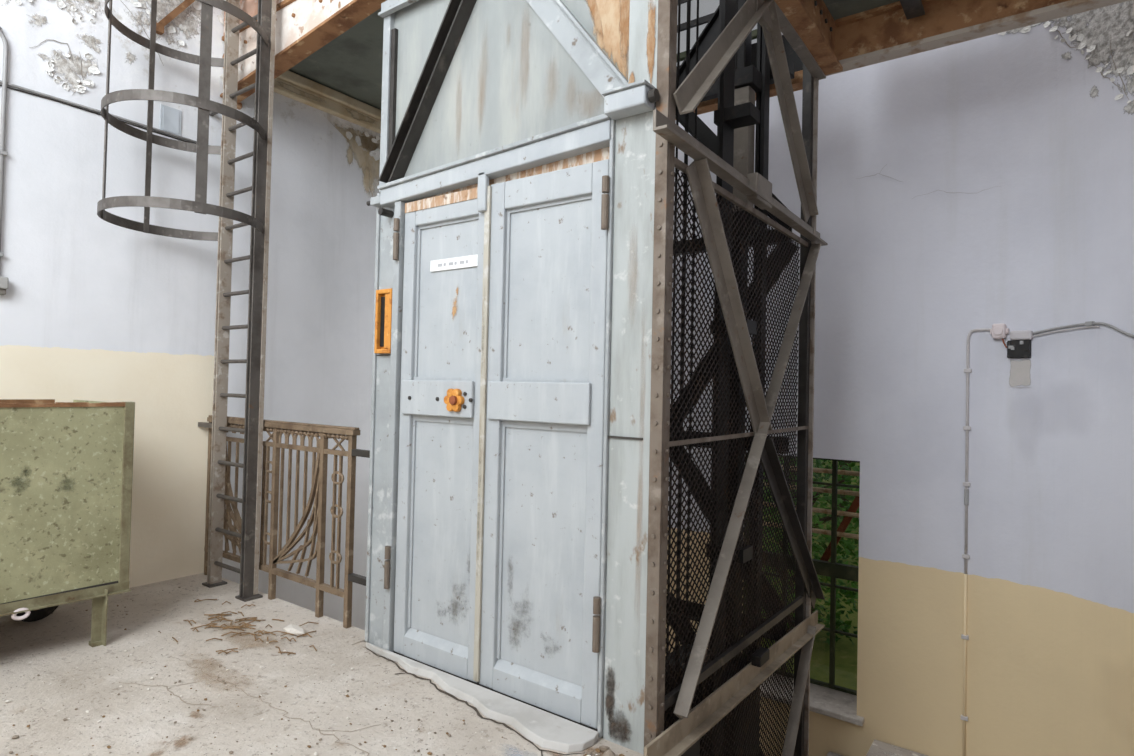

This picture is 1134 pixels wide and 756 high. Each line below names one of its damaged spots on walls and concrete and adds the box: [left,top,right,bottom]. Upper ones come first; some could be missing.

flaking render [6,0,47,26]
flaking render [30,0,103,94]
flaking render [120,0,201,47]
flaking render [998,0,1134,115]
flaking render [346,129,380,161]
crack [120,657,381,756]
crack [365,647,581,756]